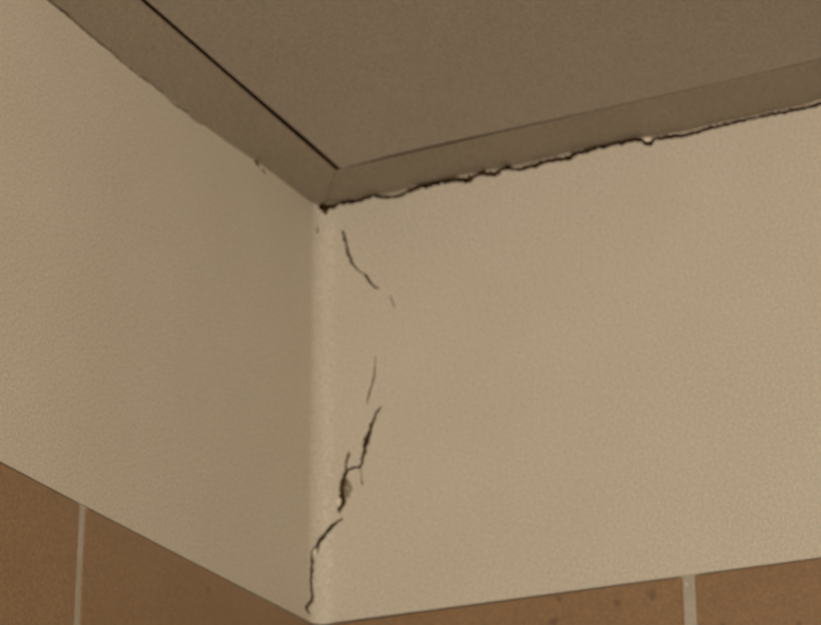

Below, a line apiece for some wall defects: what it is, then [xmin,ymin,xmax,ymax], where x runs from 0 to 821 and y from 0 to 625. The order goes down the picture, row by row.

crack [317,102,821,233]
crack [342,229,395,309]
crack [305,356,382,616]